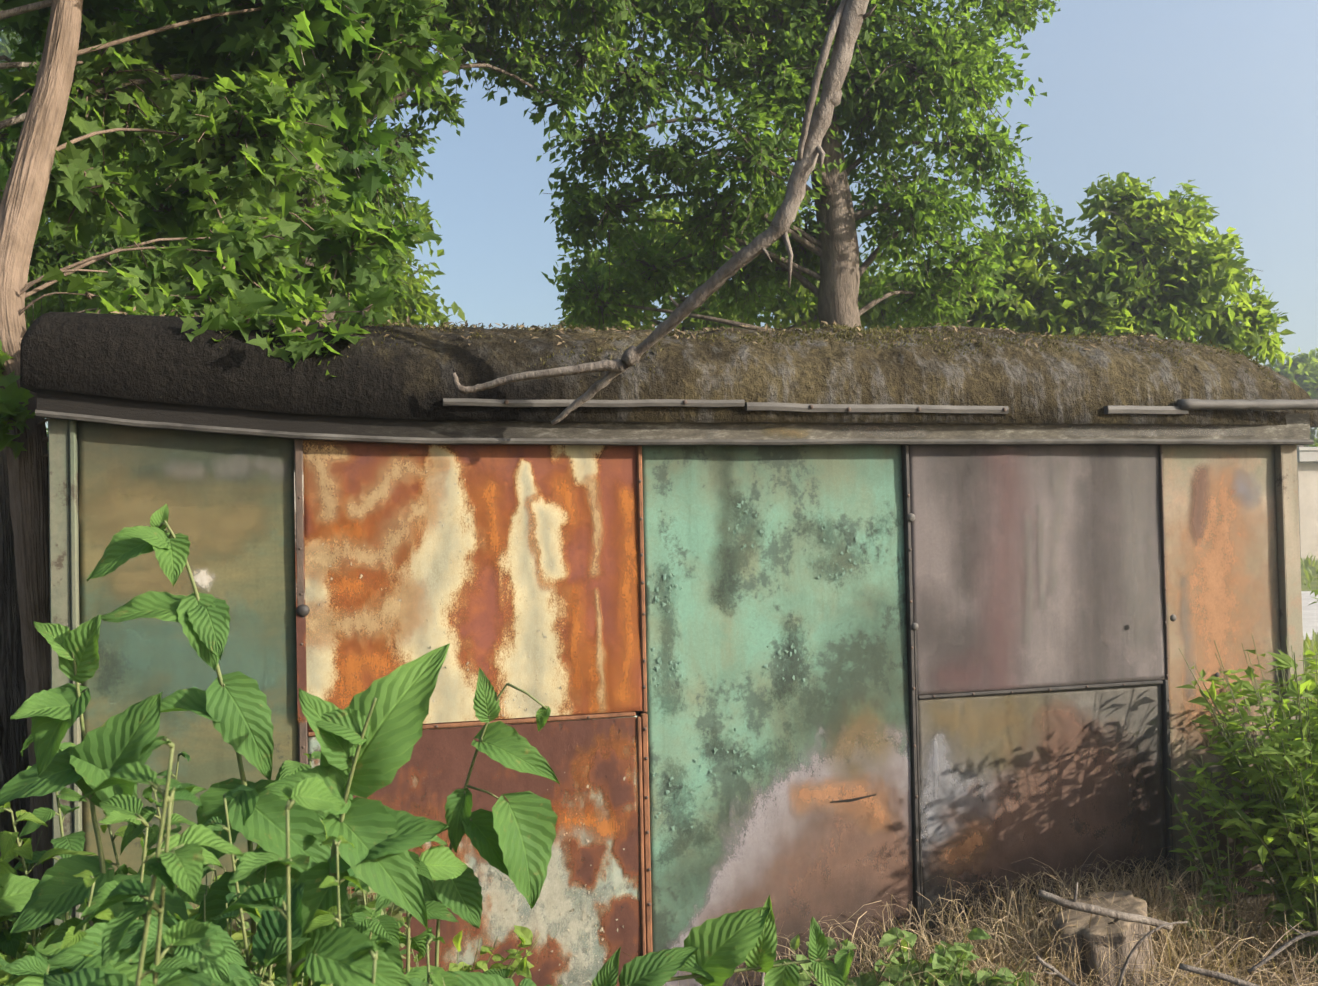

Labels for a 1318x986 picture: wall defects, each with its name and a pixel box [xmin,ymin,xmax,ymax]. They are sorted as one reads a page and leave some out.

rust [334,640,399,710]
rust [353,474,641,986]
rust [735,781,914,983]
rust [930,727,1161,927]